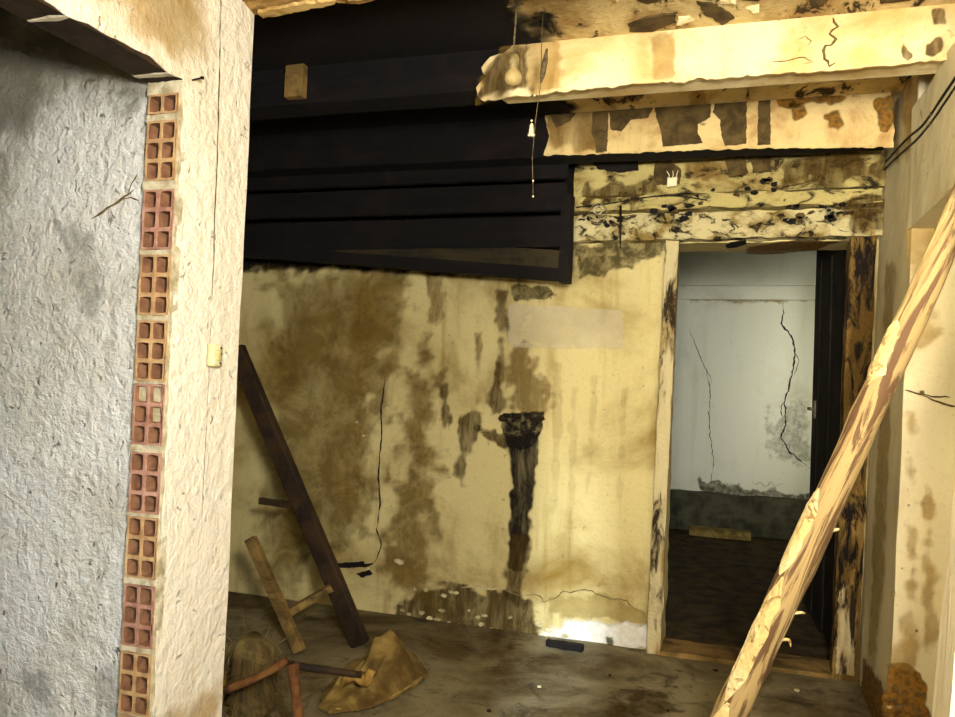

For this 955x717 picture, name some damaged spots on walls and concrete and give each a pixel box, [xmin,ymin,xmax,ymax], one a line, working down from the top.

peeling [476,0,955,104]
leakage [245,211,561,224]
leakage [246,164,662,216]
spalling [578,216,626,235]
peeling [544,92,895,225]
leakage [243,258,408,551]
crack [689,329,714,485]
crack [780,306,810,469]
crack [338,376,404,578]
leakage [381,342,550,606]
spalling [396,582,648,635]
corrosion [861,659,931,717]